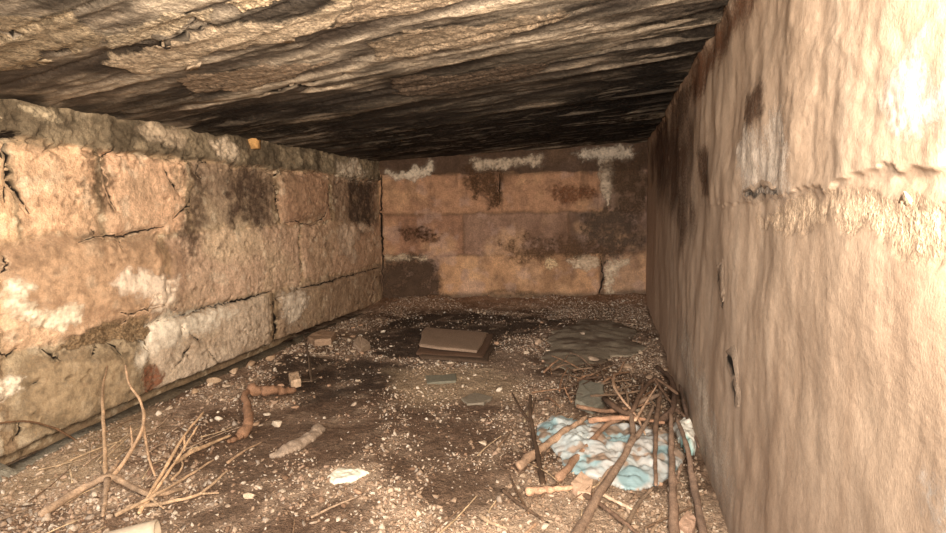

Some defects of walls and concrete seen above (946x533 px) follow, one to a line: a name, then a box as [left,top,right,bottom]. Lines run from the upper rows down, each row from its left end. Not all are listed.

water stain [878,26,946,141]
crack [0,143,31,215]
crack [78,146,207,249]
water stain [137,121,186,149]
water stain [179,170,206,256]
water stain [187,7,724,298]
water stain [735,78,790,197]
crack [0,255,12,274]
crack [90,170,386,366]
crack [0,347,17,360]
crack [40,348,62,362]